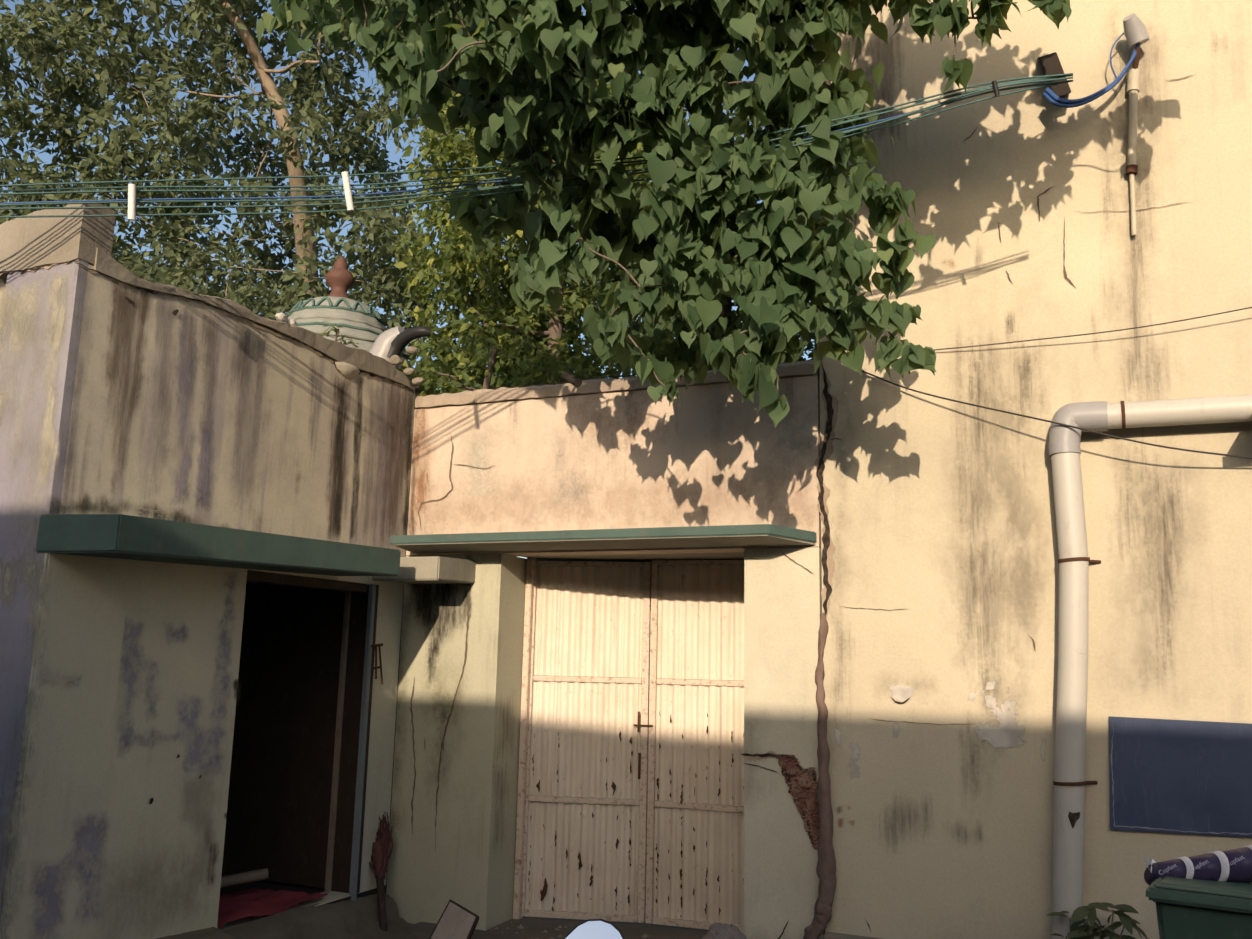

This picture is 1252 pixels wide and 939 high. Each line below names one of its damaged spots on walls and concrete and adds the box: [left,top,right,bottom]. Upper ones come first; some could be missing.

water stain [108,288,214,523]
water stain [328,381,428,538]
crack [413,437,492,527]
crack [783,362,900,619]
water stain [413,584,471,665]
crack [410,584,469,852]
peeling [889,684,914,704]
peeling [968,681,1028,749]
corrosion [528,845,555,911]
corrosion [530,815,593,900]
corrosion [655,732,744,917]
flaking render [777,754,820,849]